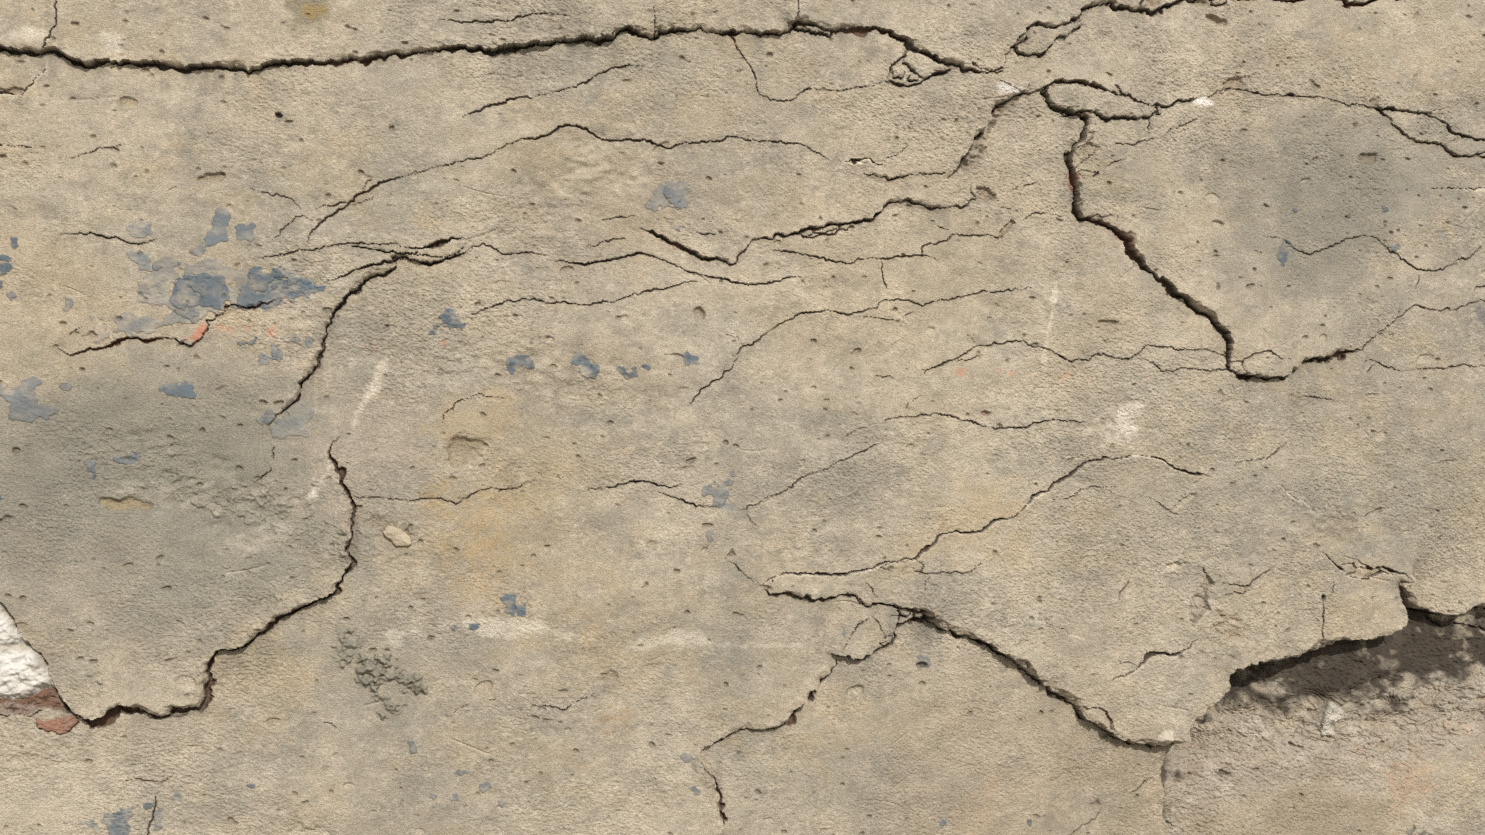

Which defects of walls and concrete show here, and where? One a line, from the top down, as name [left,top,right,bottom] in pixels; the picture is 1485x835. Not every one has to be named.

crack [0,0,1485,527]
flaking render [0,602,79,735]
crack [123,773,175,835]
crack [57,442,564,730]
crack [532,695,600,712]
crack [700,443,1299,835]
spalling [1160,574,1485,835]
crack [1321,552,1485,643]